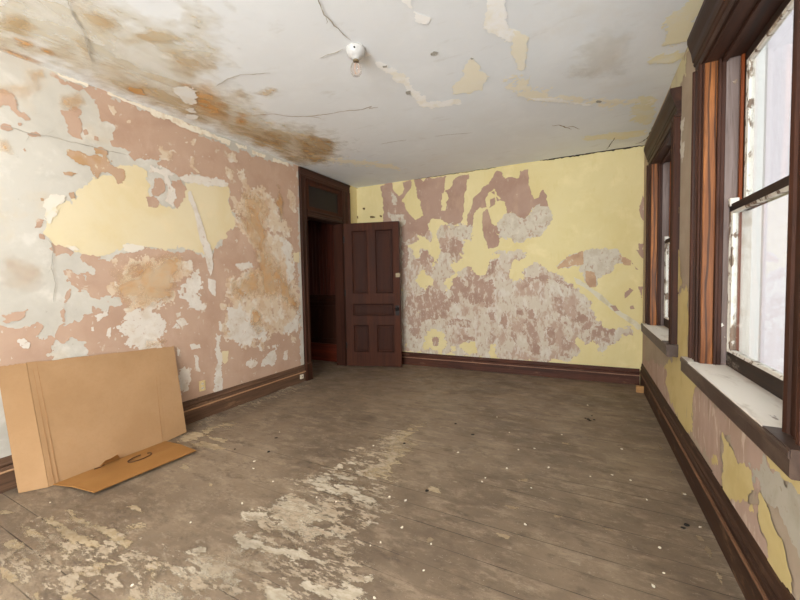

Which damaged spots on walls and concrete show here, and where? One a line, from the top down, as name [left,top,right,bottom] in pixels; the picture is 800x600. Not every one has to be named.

crack [68,1,102,63]
crack [318,0,350,58]
peeling [483,0,529,77]
peeling [361,44,489,109]
crack [3,126,126,155]
peeling [581,96,658,141]
peeling [0,71,303,402]
peeling [350,169,638,362]
peeling [642,249,800,593]